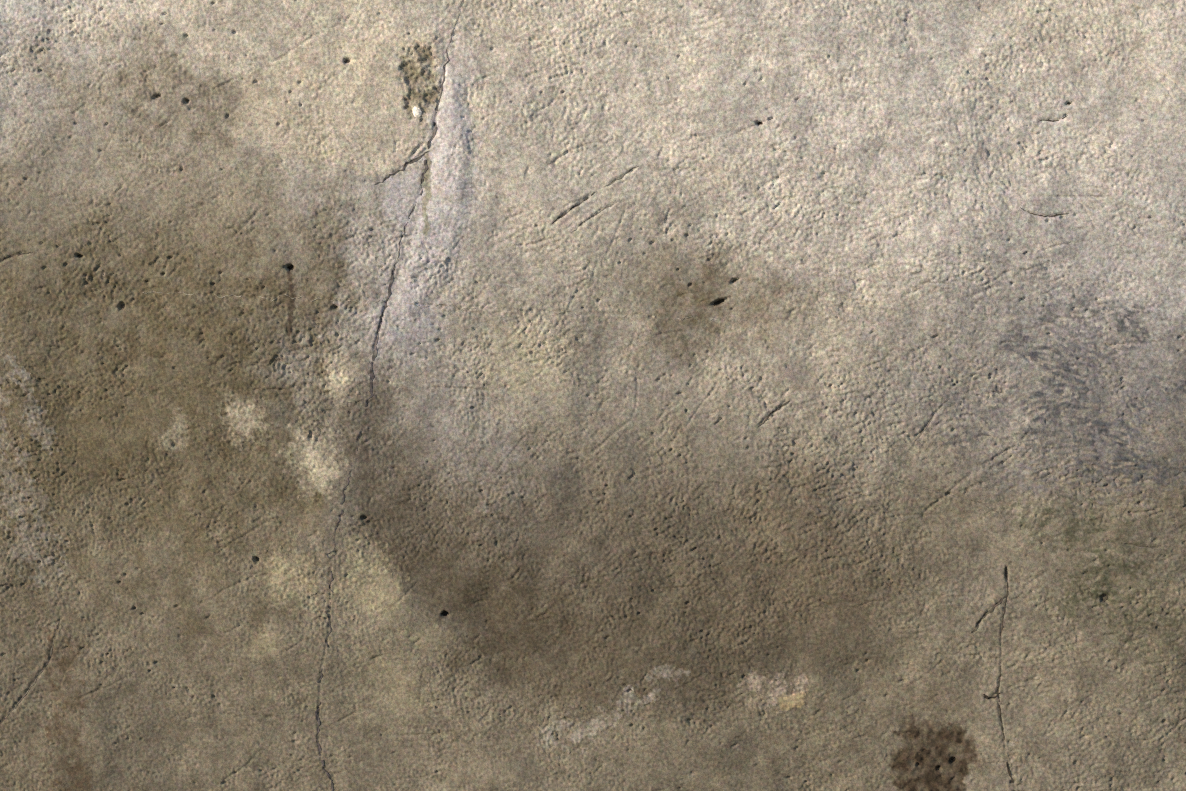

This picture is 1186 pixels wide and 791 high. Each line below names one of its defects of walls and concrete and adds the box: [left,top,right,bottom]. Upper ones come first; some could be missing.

damp [420,2,484,96]
crack [315,0,463,791]
damp [531,202,854,402]
damp [886,234,1186,527]
damp [672,448,931,658]
damp [533,663,691,759]